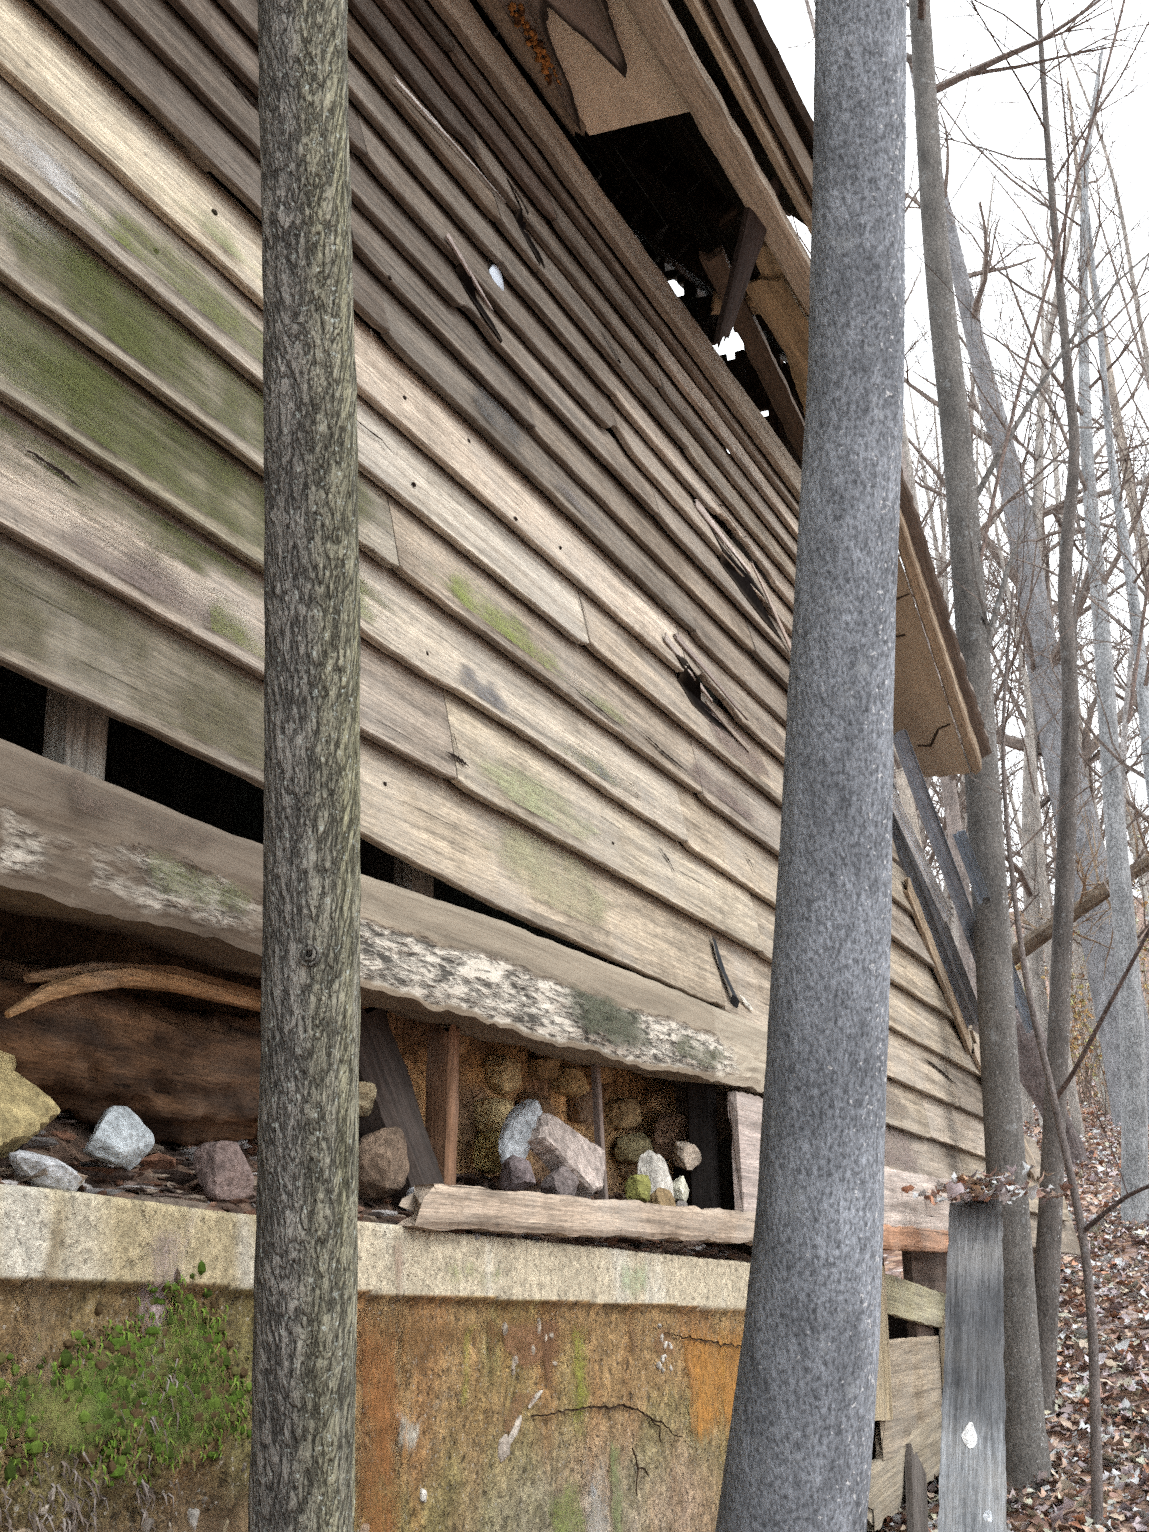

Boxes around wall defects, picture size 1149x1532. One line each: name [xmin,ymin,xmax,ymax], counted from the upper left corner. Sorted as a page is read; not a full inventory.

corrosion [686,1337,741,1437]
crack [530,1404,683,1496]